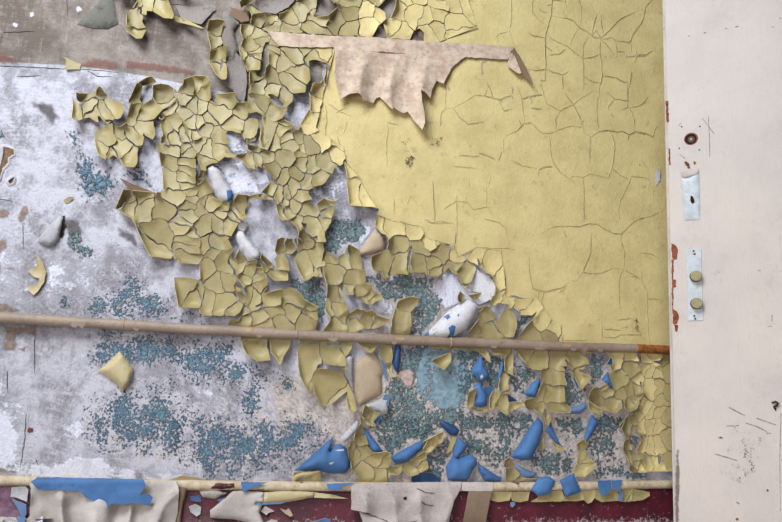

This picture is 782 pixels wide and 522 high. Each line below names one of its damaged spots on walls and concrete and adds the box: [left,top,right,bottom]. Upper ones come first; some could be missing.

crack [320,102,352,155]
flaking render [0,144,17,187]
crack [374,0,660,345]
peeling [71,0,672,490]
spalling [671,243,679,332]
peeling [490,439,650,507]
peeling [10,486,29,517]
peeling [189,482,267,522]
peeling [260,506,298,522]